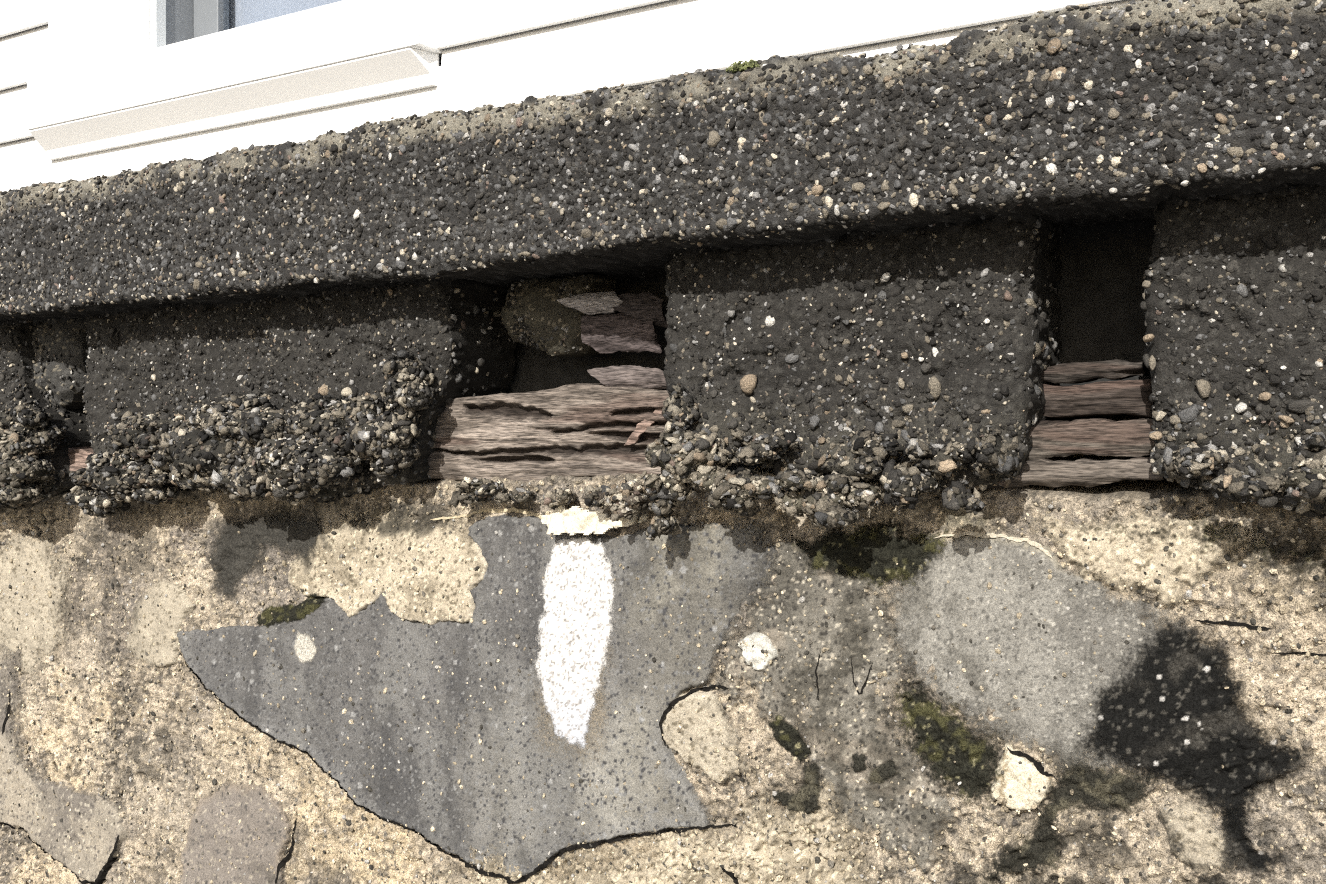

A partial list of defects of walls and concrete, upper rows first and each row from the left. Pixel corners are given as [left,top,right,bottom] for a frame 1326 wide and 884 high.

peeling [0,523,72,682]
leakage [207,511,322,598]
peeling [288,505,649,625]
spalling [737,632,778,671]
spalling [662,690,746,784]
leakage [1082,621,1309,884]